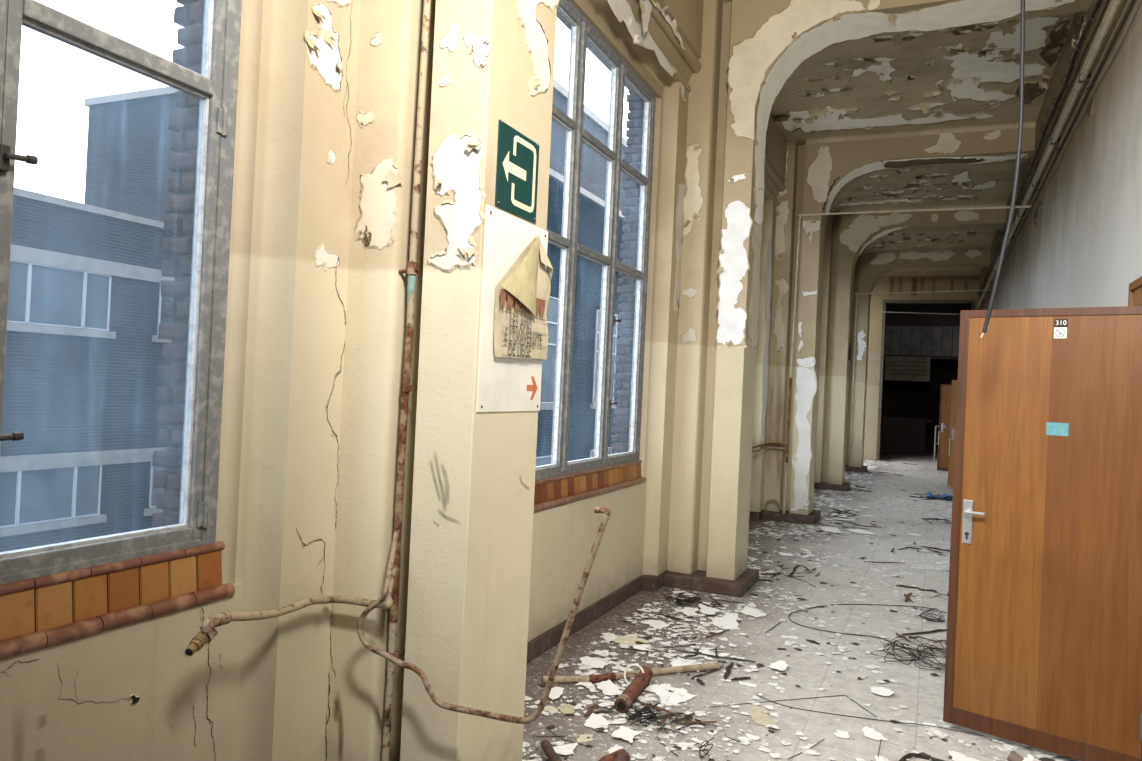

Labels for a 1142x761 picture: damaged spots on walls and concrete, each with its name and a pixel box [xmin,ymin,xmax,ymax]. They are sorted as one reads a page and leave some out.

peeling [304,0,350,94]
peeling [439,22,492,69]
peeling [515,0,559,97]
peeling [627,0,685,50]
peeling [354,157,403,250]
peeling [426,131,486,274]
peeling [673,143,706,318]
peeling [716,0,1087,511]
crack [0,659,127,704]
crack [193,607,222,756]